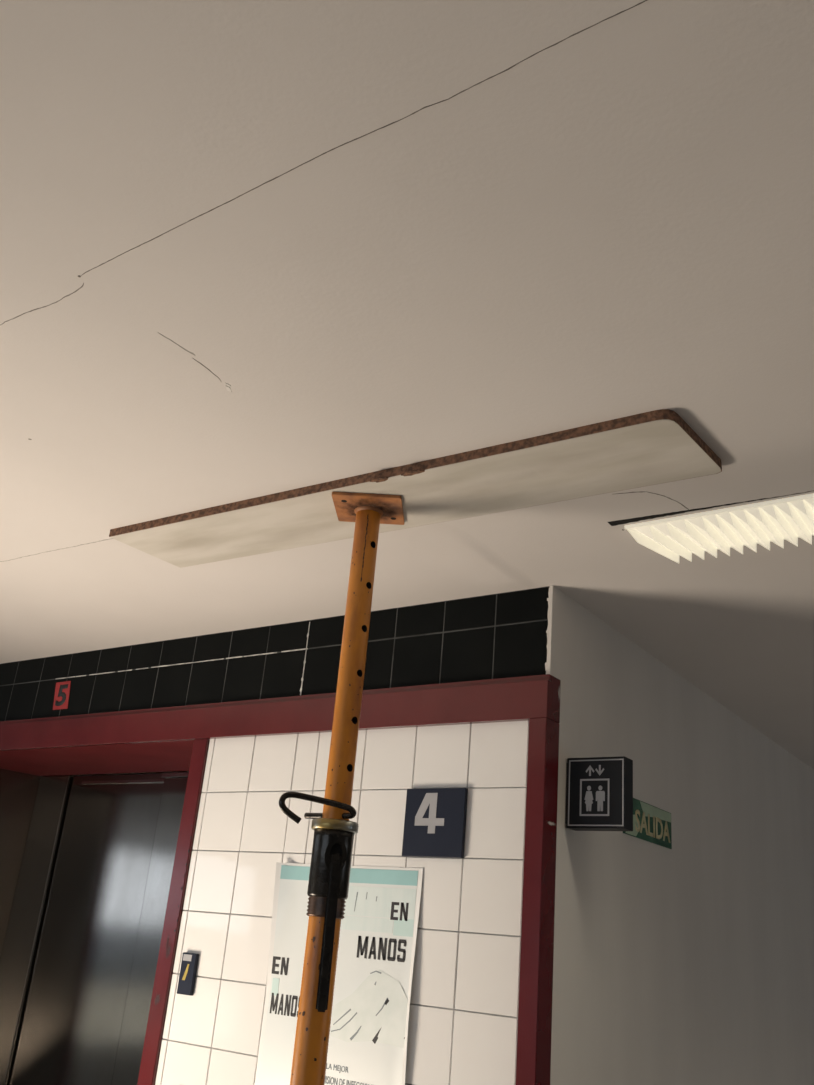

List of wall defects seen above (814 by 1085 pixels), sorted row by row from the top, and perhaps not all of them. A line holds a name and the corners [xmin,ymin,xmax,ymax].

crack [1,0,647,325]
crack [159,333,232,392]